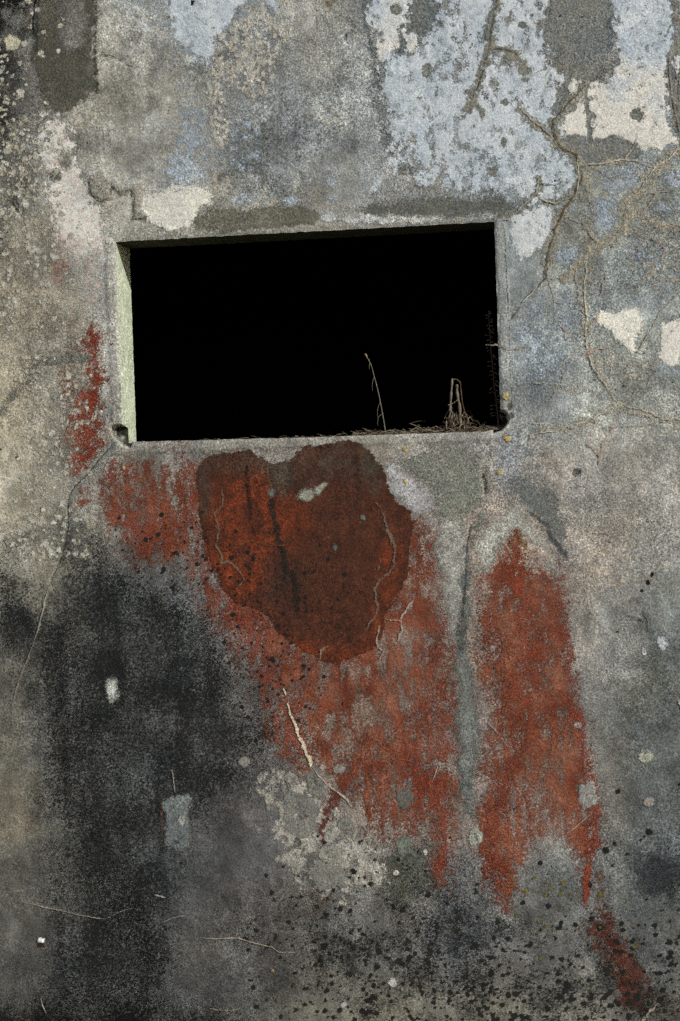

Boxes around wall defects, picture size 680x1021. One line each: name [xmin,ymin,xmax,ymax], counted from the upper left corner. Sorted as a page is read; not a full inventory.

crack [461,0,532,120]
peeling [357,0,680,267]
crack [491,48,680,488]
peeling [593,308,680,386]
leakage [0,428,680,1021]
rust [59,322,658,1020]